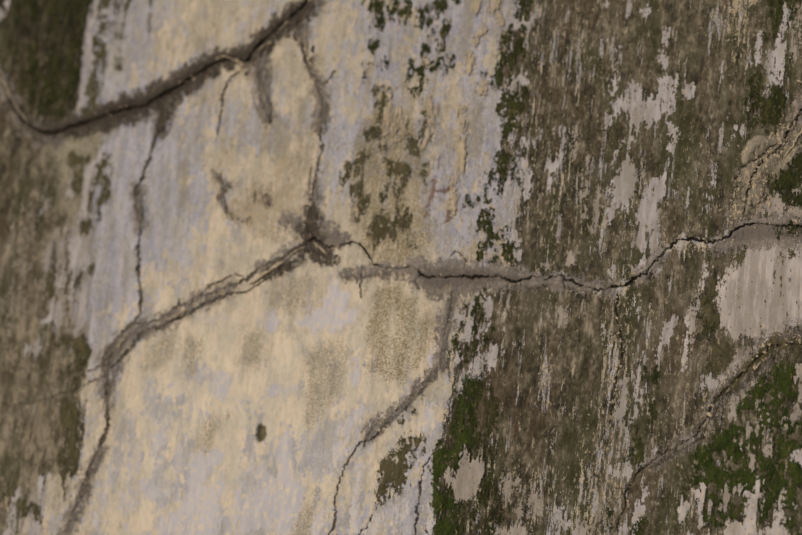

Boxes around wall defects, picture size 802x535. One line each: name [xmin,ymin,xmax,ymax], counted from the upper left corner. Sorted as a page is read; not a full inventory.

leakage [41,120,123,237]
crack [0,0,328,151]
crack [291,17,336,208]
crack [56,80,802,535]
leakage [447,286,505,395]
peeling [606,238,802,535]